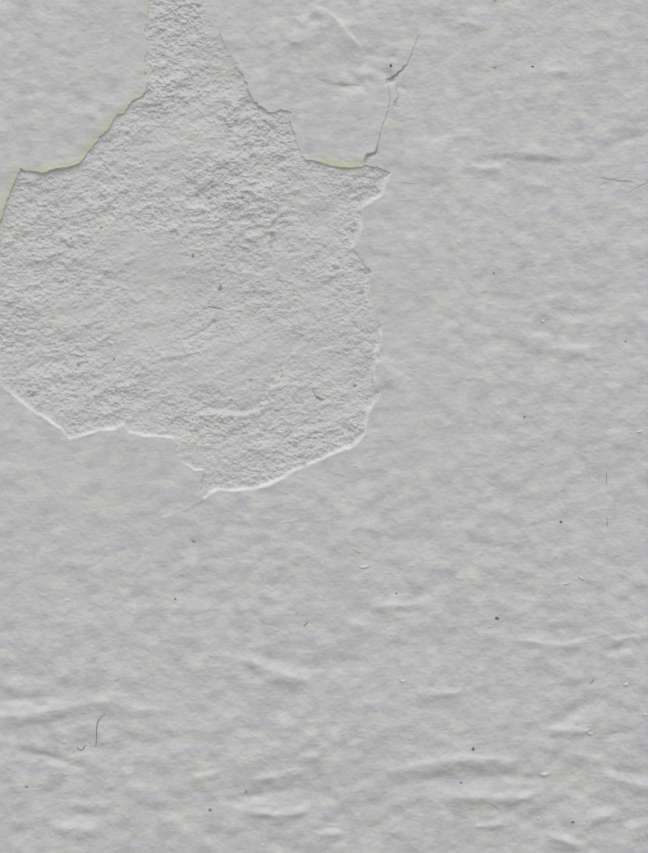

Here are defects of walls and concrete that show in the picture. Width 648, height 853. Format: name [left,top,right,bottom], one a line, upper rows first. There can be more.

peeling [0,0,399,500]
crack [317,0,423,154]